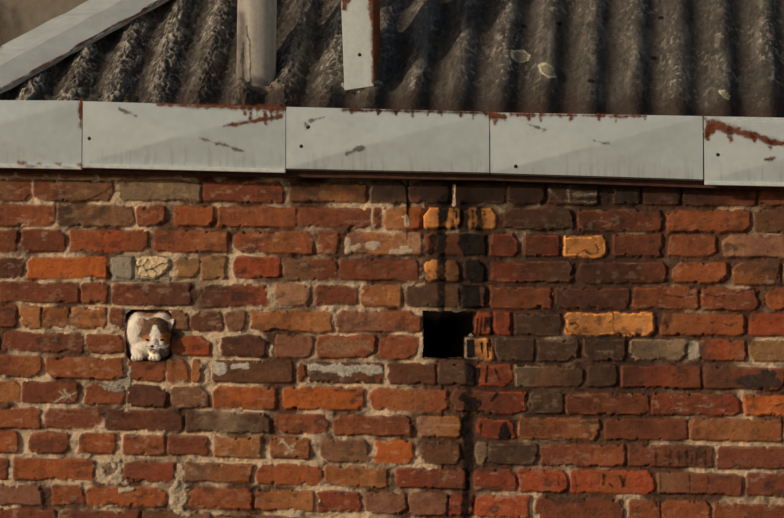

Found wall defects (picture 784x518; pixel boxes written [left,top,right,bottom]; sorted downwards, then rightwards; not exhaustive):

rust [0,0,159,90]
rust [368,0,381,86]
rust [157,103,286,126]
rust [342,107,646,124]
rust [704,120,784,161]
leakage [405,183,485,314]
spalling [422,310,474,359]
leakage [479,317,493,358]
leakage [458,392,498,413]